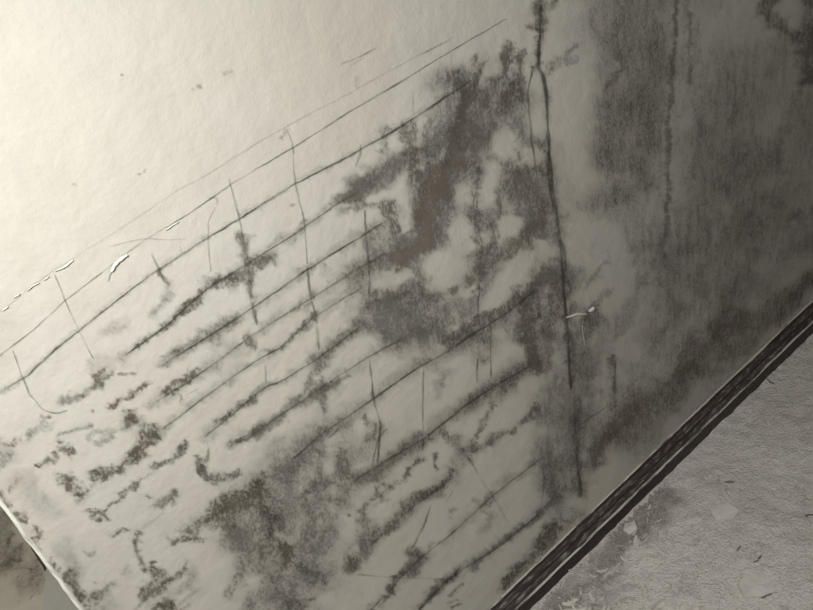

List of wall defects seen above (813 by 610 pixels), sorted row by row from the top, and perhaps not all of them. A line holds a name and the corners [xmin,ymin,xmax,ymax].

crack [531,17,554,196]
crack [130,273,233,352]
leakage [174,233,275,317]
crack [209,208,257,237]
crack [301,152,355,181]
crack [300,213,382,276]
leakage [334,0,575,405]
crack [371,369,415,401]
leakage [90,410,160,482]
leakage [172,430,327,610]
leakage [62,571,104,606]
leakage [133,533,186,610]